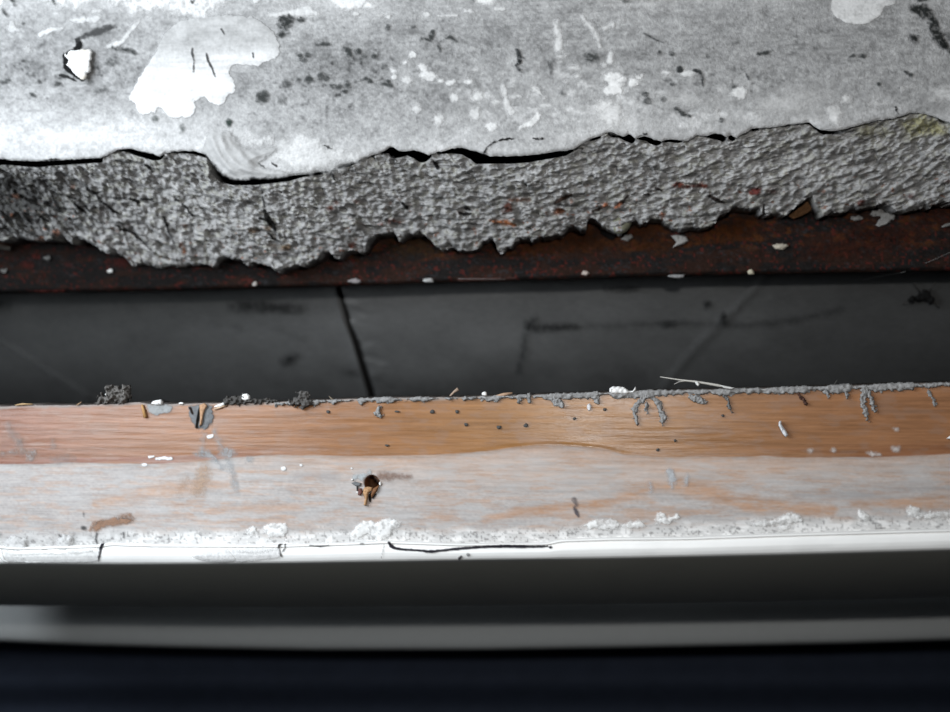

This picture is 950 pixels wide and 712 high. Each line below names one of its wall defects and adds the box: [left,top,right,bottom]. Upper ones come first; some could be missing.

crack [707,128,756,141]
crack [807,122,834,134]
crack [0,157,103,168]
crack [126,149,209,173]
crack [238,132,680,241]
spalling [0,113,950,275]
crack [708,195,725,204]
crack [13,187,195,251]
corrosion [489,200,516,227]